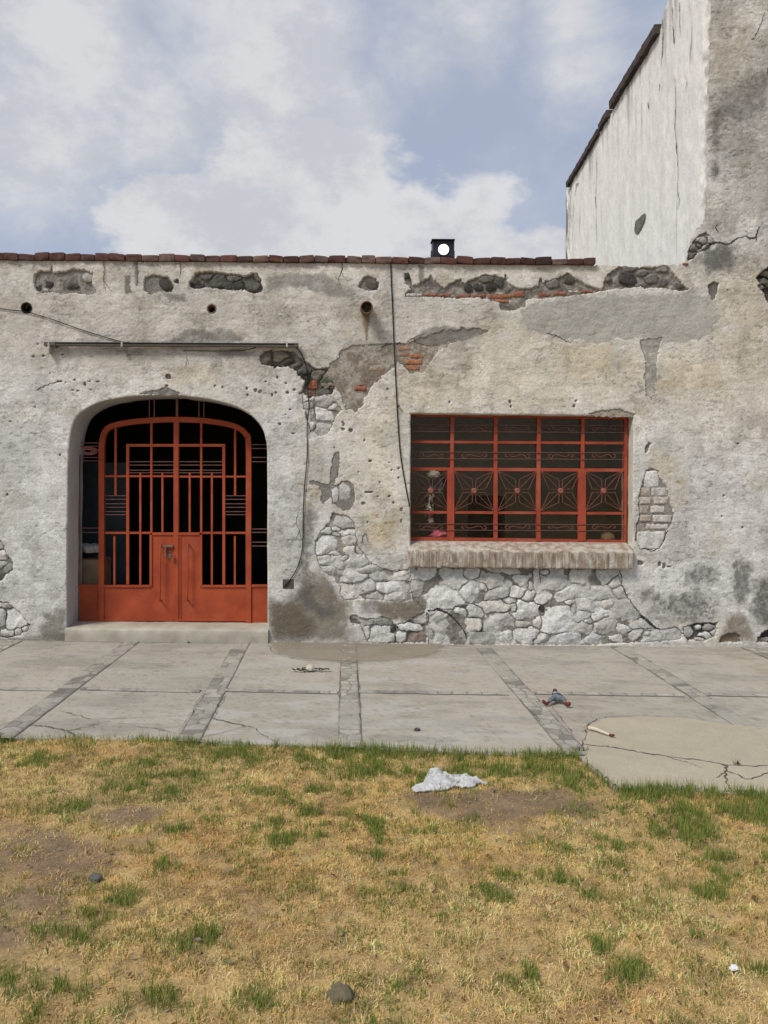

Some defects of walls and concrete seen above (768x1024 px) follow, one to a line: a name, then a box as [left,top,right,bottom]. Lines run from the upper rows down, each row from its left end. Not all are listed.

crack [629,7,760,253]
flaking render [35,267,96,295]
flaking render [144,273,263,295]
flaking render [404,266,687,311]
peeling [246,328,488,432]
peeling [309,446,403,523]
flaking render [635,468,674,565]
water stain [270,560,422,642]
crack [519,699,768,789]